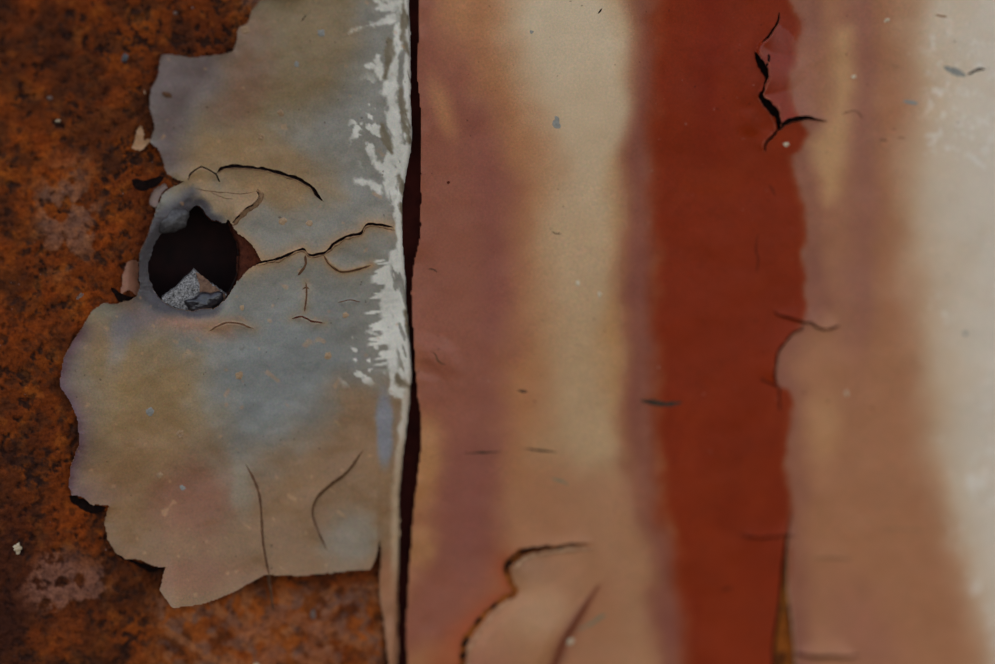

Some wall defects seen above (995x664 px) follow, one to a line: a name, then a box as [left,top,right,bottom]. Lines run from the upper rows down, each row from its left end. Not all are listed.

crack [755,14,863,152]
corrosion [36,171,97,254]
peeling [131,123,155,151]
crack [132,176,164,191]
crack [188,164,323,226]
peeling [61,260,146,401]
peeling [137,0,412,606]
crack [256,223,393,323]
corrosion [405,0,982,664]
crack [312,451,363,549]
corrosion [25,555,104,611]
peeling [459,543,598,664]